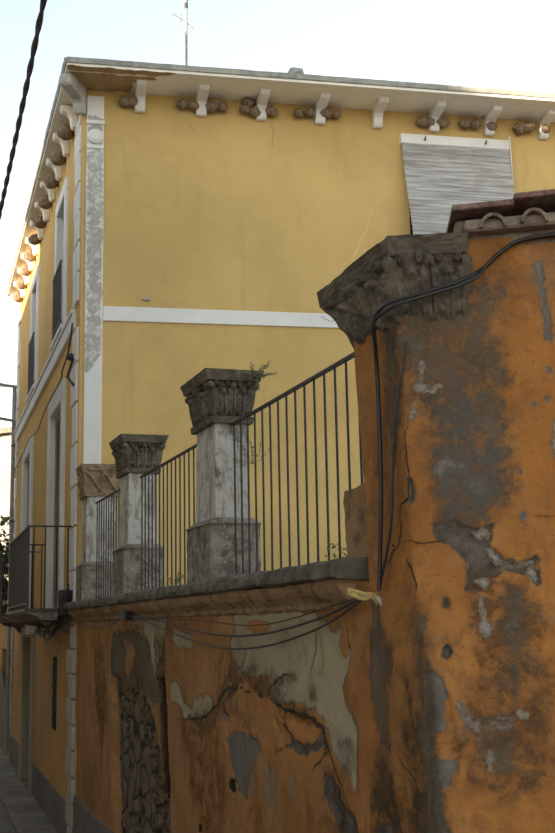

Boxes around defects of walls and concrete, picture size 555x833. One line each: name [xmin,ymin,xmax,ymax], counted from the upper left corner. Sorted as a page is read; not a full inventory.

spalling [67,64,175,92]
peeling [413,360,443,394]
water stain [382,276,517,525]
crack [387,427,447,590]
spalling [431,518,542,642]
peeling [132,619,193,678]
peeling [170,679,212,719]
spalling [227,730,261,800]
crack [179,634,356,831]
peeling [229,611,358,792]
spalling [322,772,358,833]
water stain [369,601,447,833]